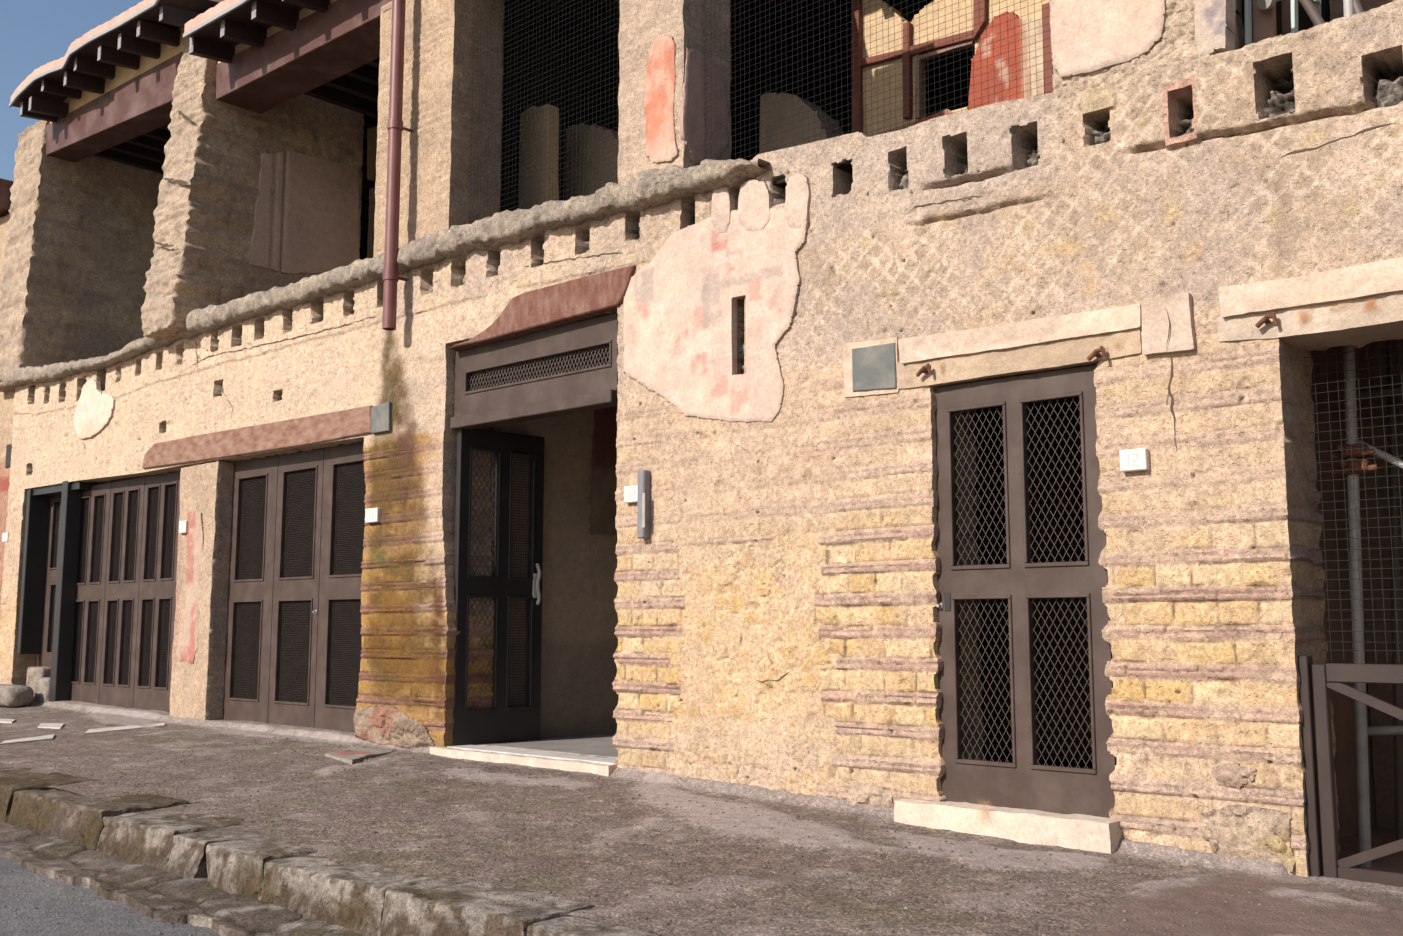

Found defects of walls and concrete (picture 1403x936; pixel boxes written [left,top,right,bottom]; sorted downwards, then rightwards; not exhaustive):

damp [369,331,442,705]
crack [1166,310,1177,452]